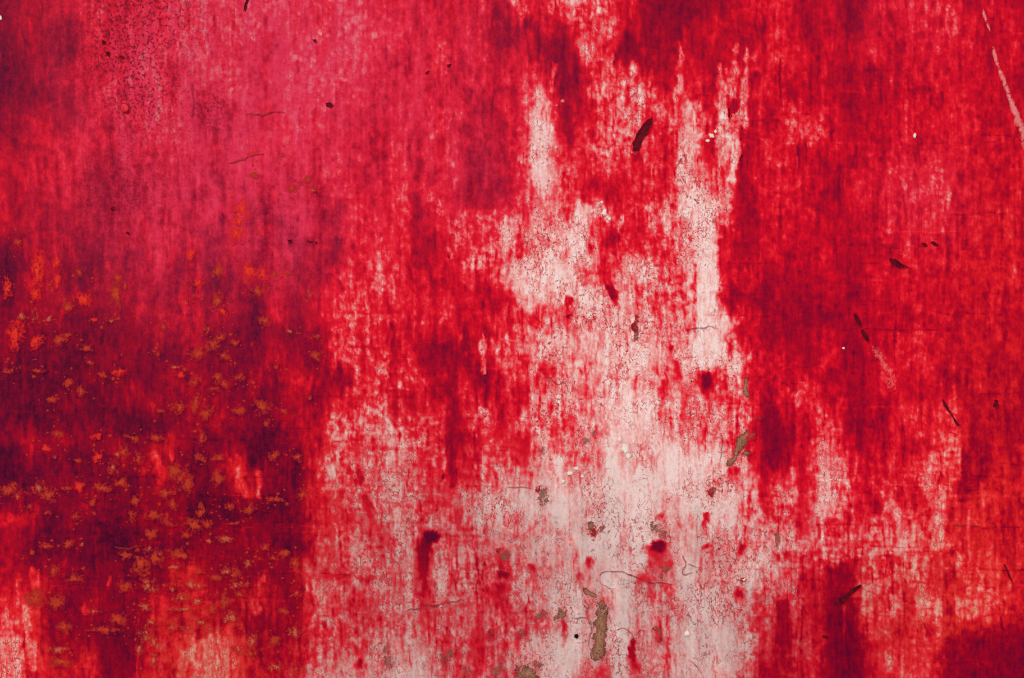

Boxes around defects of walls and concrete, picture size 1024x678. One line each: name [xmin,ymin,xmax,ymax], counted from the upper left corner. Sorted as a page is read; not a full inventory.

peeling [106,0,403,165]
rust [0,186,327,677]
peeling [289,0,1023,678]